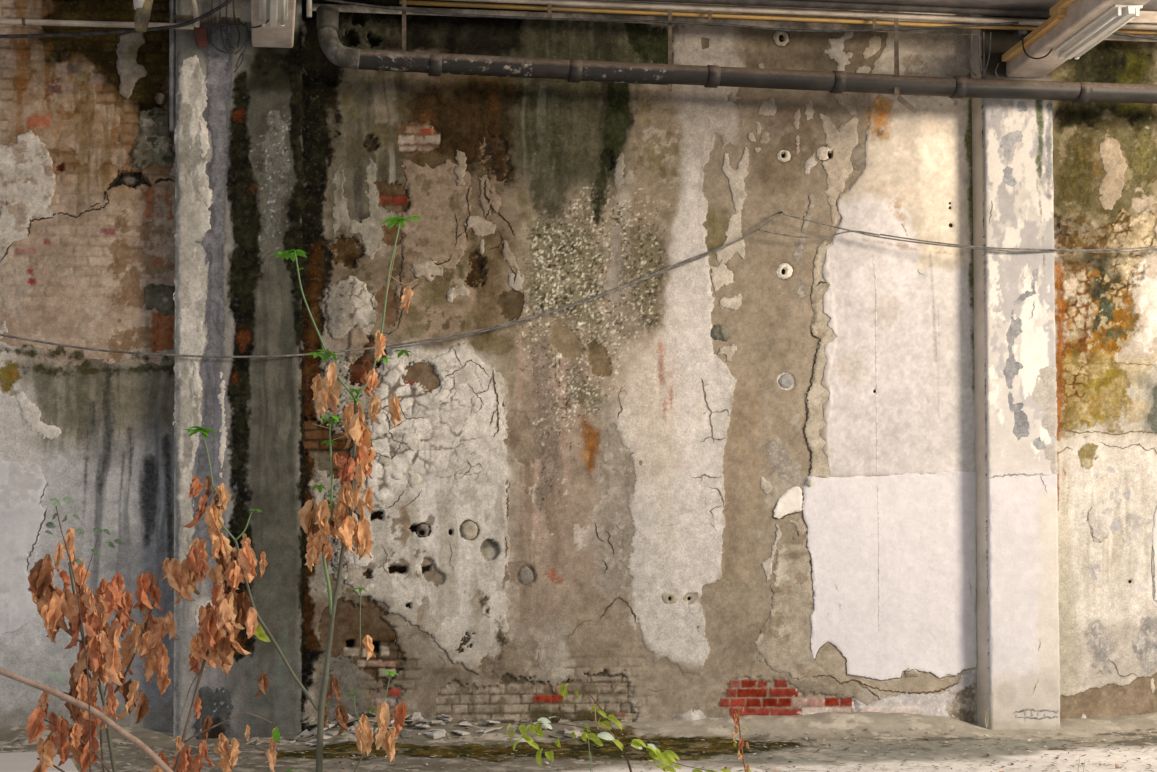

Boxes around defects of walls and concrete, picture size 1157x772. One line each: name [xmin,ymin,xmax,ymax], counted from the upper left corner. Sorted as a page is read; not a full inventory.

damp [326,0,528,56]
damp [1066,44,1153,84]
damp [332,159,386,260]
damp [1046,101,1153,198]
flaking render [0,0,214,564]
crack [345,176,517,675]
corrosion [582,421,599,470]
peeling [434,87,977,724]
crack [774,329,821,591]
peeling [1003,269,1059,475]
flaking render [318,596,406,717]
crack [813,604,975,700]